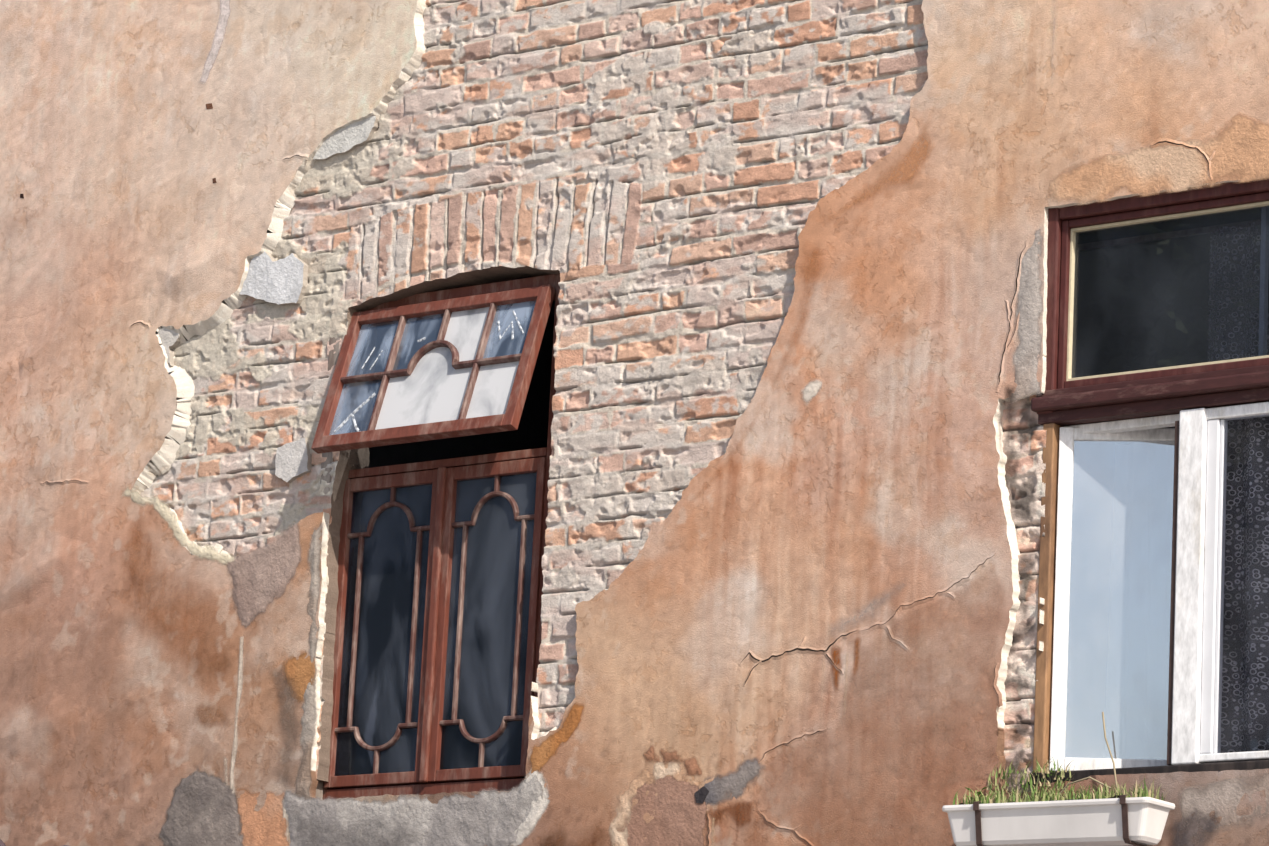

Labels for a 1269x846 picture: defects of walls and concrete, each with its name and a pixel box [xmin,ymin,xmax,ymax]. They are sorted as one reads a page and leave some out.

crack [1150,138,1216,180]
crack [995,238,1030,392]
spalling [124,0,928,846]
spalling [1001,229,1047,793]
crack [738,549,999,686]
spalling [1065,507,1075,758]
crack [758,727,827,764]
crack [757,808,815,846]
water stain [1173,812,1217,846]